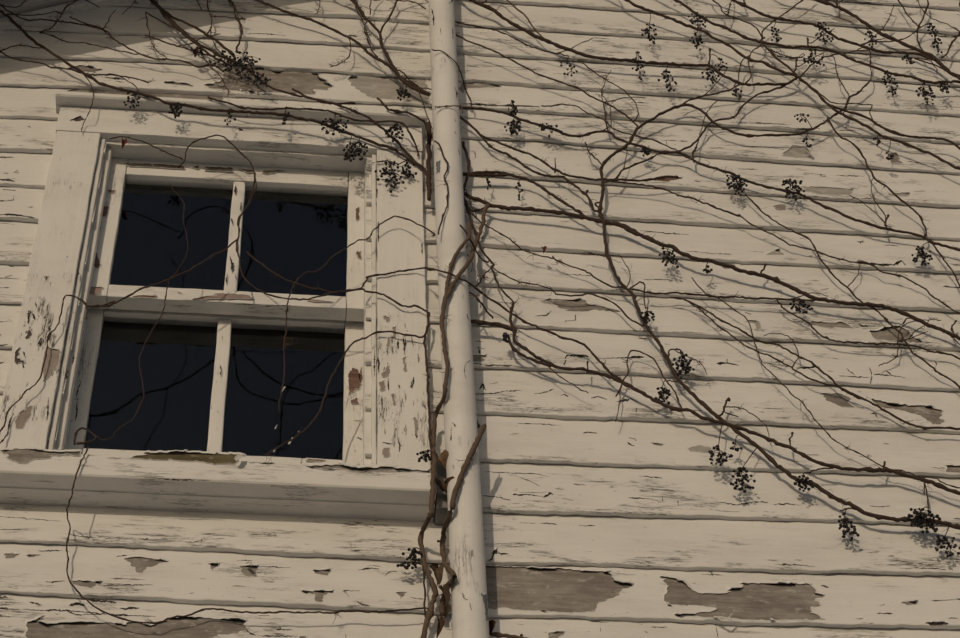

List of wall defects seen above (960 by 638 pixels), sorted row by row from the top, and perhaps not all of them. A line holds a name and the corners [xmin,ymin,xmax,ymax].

peeling [66,64,334,100]
peeling [347,74,430,103]
peeling [14,303,62,381]
peeling [347,366,363,405]
peeling [14,404,34,429]
peeling [867,396,946,425]
peeling [0,447,82,464]
peeling [130,449,246,465]
peeling [123,555,169,573]
peeling [480,565,634,622]
peeling [659,574,825,621]
peeling [24,614,248,638]